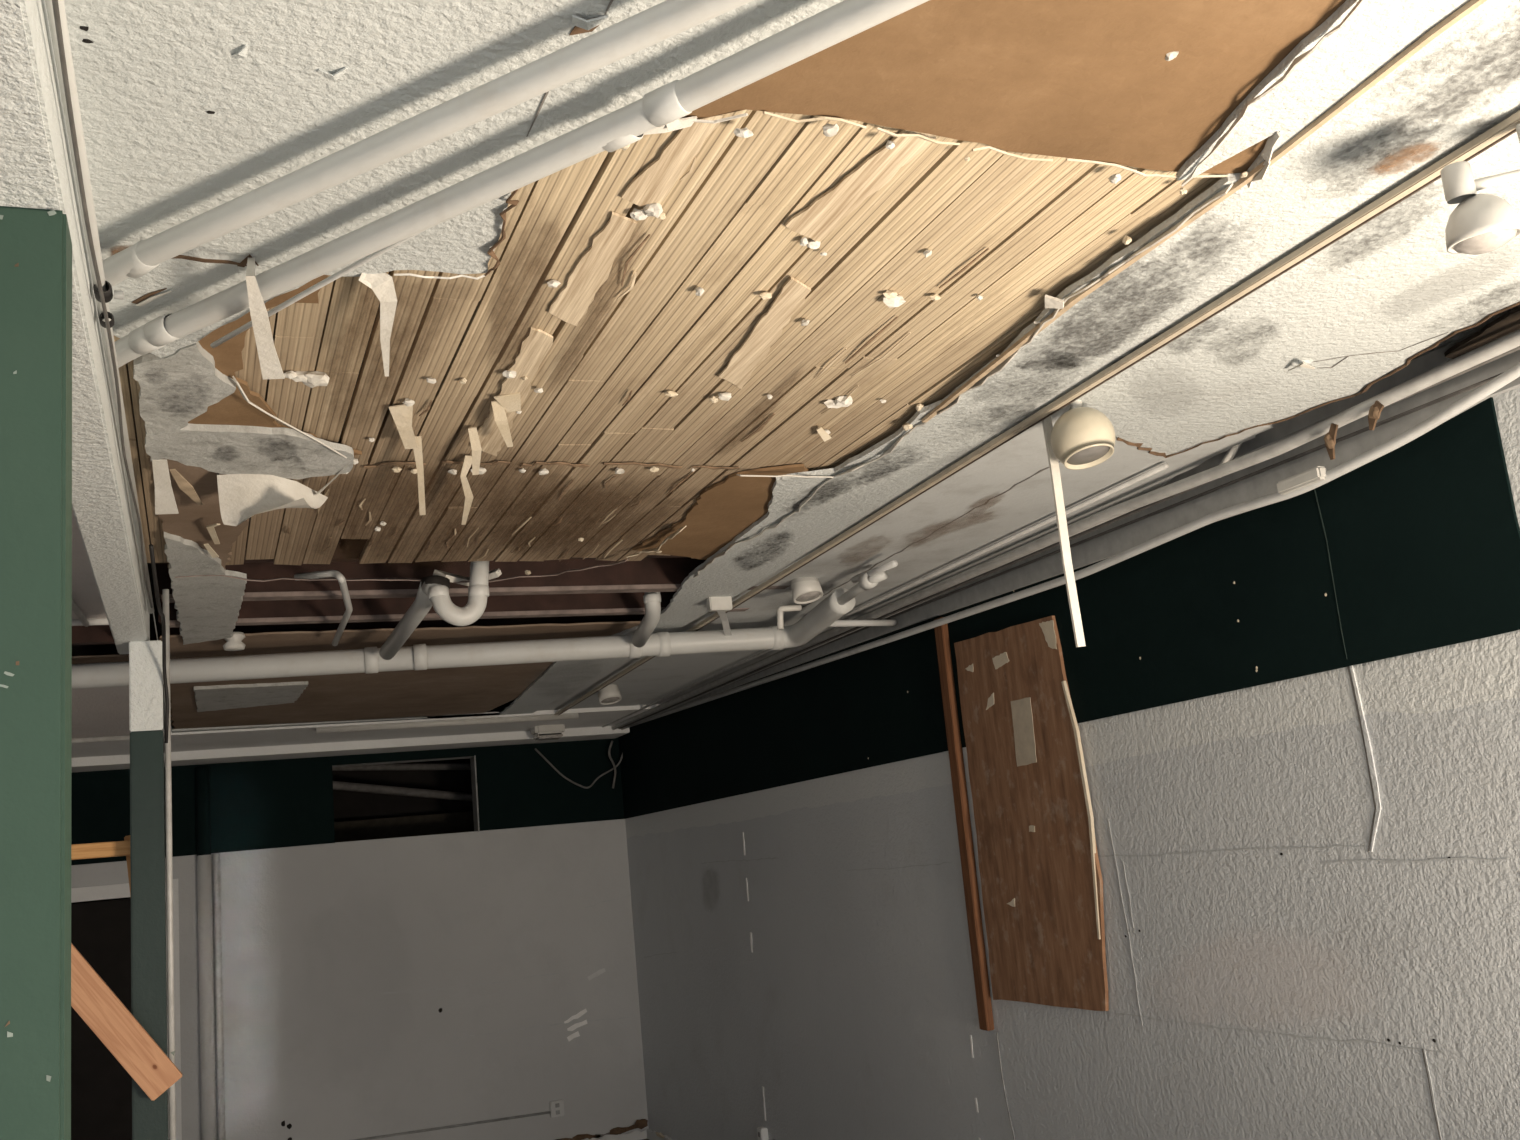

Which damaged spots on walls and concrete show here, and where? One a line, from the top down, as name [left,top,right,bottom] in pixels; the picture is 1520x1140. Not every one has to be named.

peeling [246,257,330,388]
peeling [359,189,519,377]
peeling [491,370,543,447]
peeling [621,0,1365,578]
damp [986,266,1184,402]
spalling [1116,302,1520,458]
damp [1341,221,1408,262]
peeling [152,376,426,582]
damp [339,472,467,559]
peeling [448,427,486,525]
peeling [489,526,686,582]